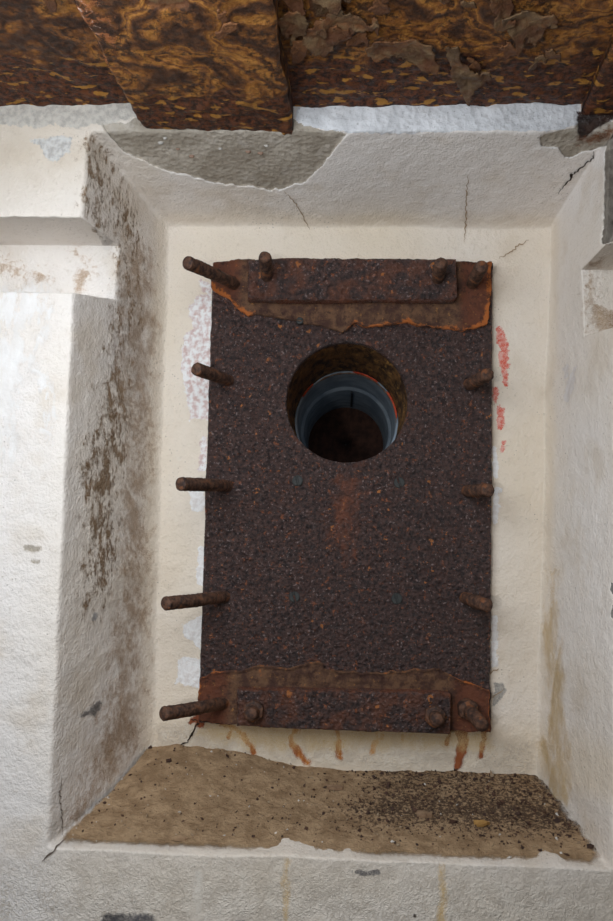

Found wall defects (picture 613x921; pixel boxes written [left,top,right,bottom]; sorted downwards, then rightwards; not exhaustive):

rust [278,0,492,106]
rust [489,0,559,71]
flaking render [103,118,346,190]
crack [559,151,594,192]
flaking render [540,122,613,244]
rust [573,111,613,147]
damp [66,133,168,827]
rust [188,715,493,770]